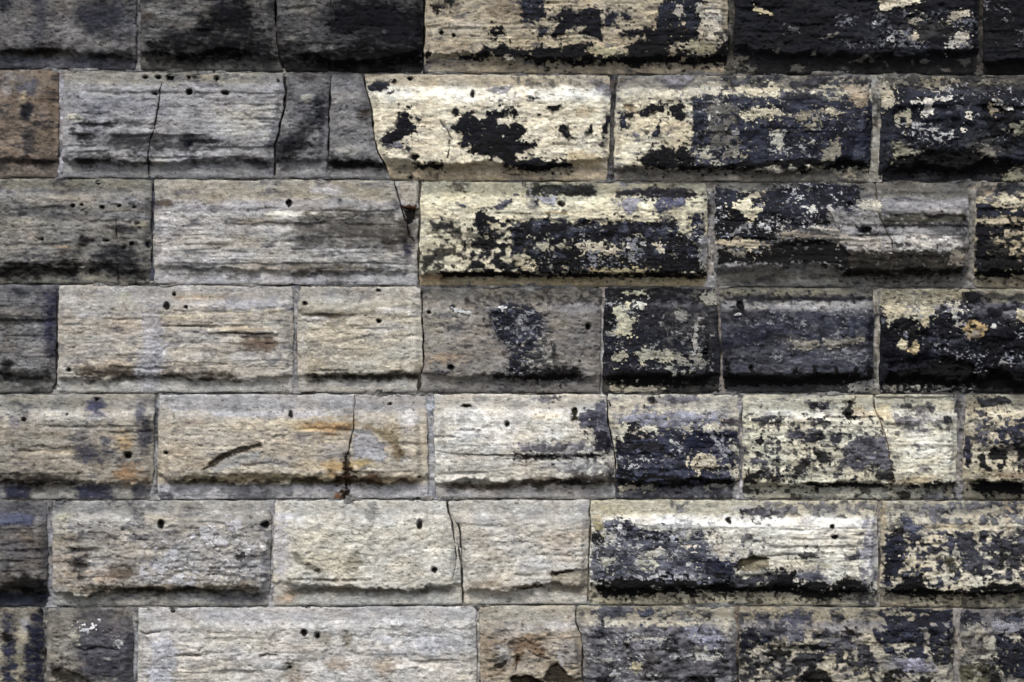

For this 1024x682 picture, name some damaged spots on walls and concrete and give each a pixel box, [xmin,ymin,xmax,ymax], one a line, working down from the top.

crack [146,84,162,178]
crack [394,181,414,241]
peeling [365,0,1024,682]
crack [336,395,365,495]
corrosion [322,451,382,499]
crack [446,502,463,602]